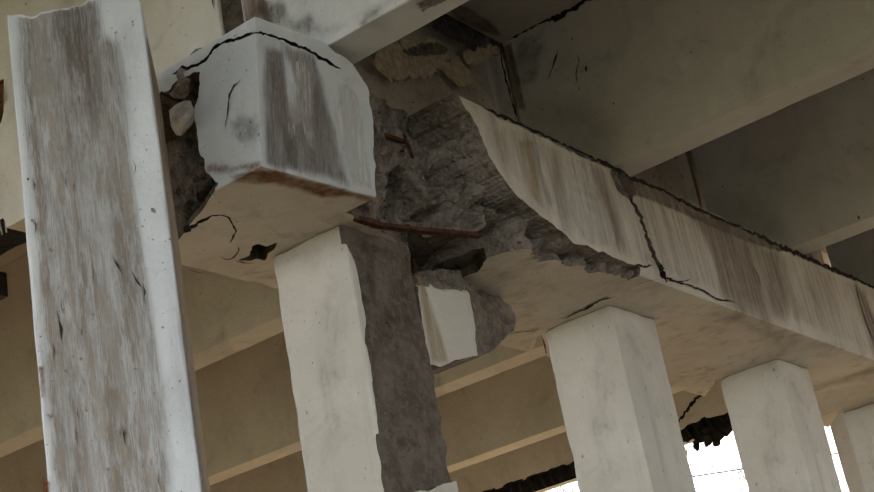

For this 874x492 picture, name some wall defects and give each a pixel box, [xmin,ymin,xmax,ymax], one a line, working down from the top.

crack [172,31,341,75]
crack [500,0,591,117]
peeling [169,101,195,136]
damp [147,39,210,492]
crack [183,215,245,274]
spalling [339,36,640,492]
crack [628,194,734,302]
crack [561,296,616,320]
crack [855,280,874,340]
crack [678,395,702,422]
spalling [680,412,733,451]